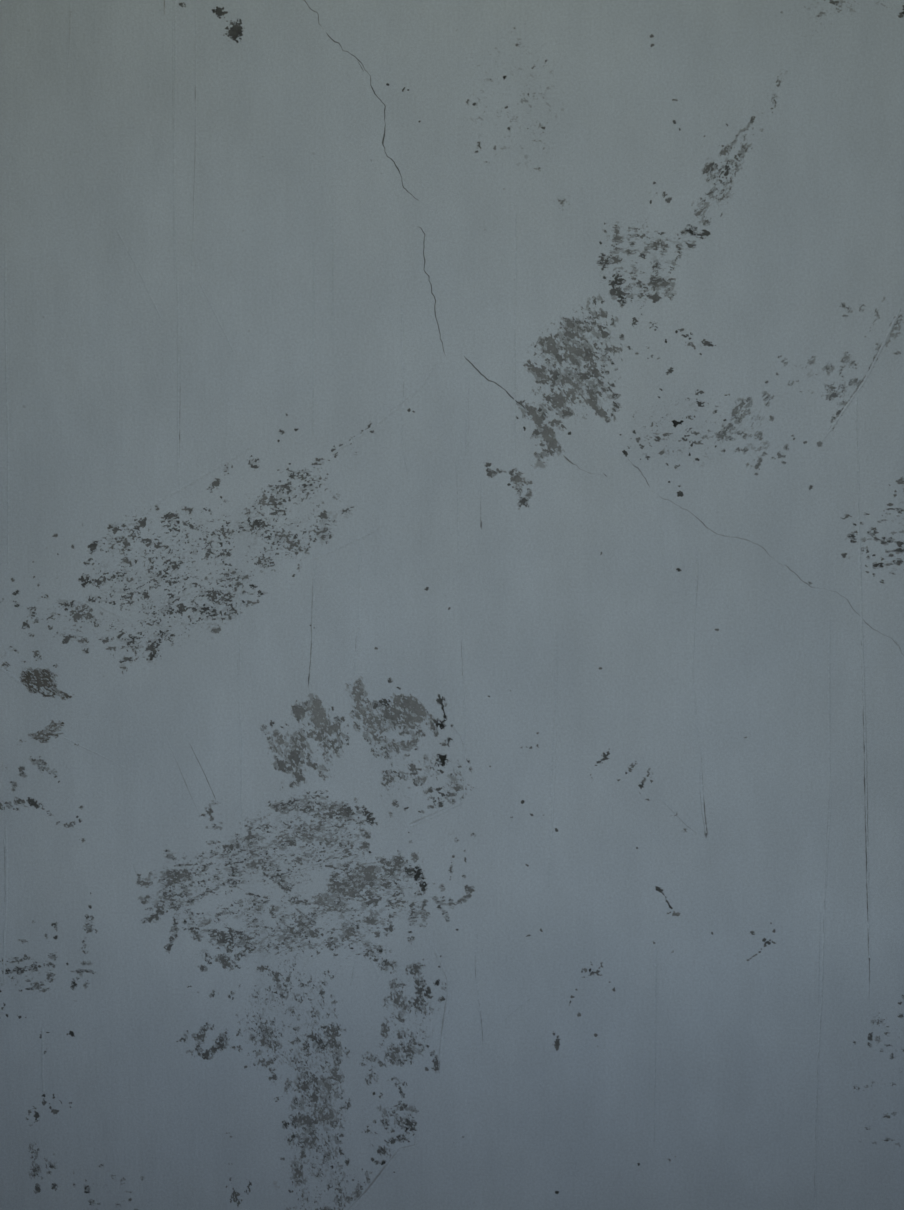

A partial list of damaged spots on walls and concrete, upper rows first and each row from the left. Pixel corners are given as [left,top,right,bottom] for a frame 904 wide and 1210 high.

spalling [211,6,245,43]
crack [303,0,527,411]
peeling [484,0,904,510]
peeling [0,420,375,701]
crack [563,455,904,656]
peeling [840,476,904,585]
peeling [0,719,86,843]
peeling [0,892,98,1019]
peeling [135,676,491,1210]